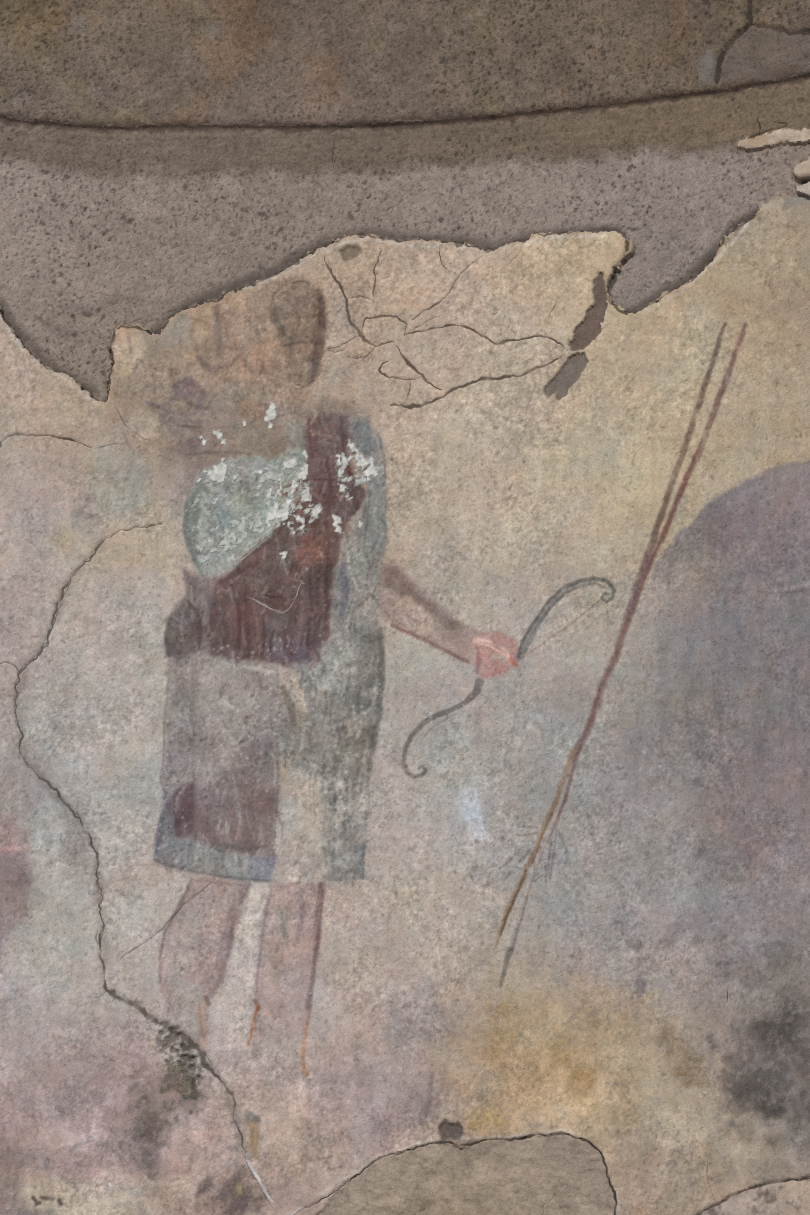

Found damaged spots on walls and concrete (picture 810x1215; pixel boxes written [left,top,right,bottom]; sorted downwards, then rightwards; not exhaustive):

crack [95,229,636,409]
flaking render [0,139,810,402]
peeling [192,431,342,566]
peeling [264,403,276,428]
peeling [336,440,380,499]
crack [15,523,161,748]
crack [39,777,220,1080]